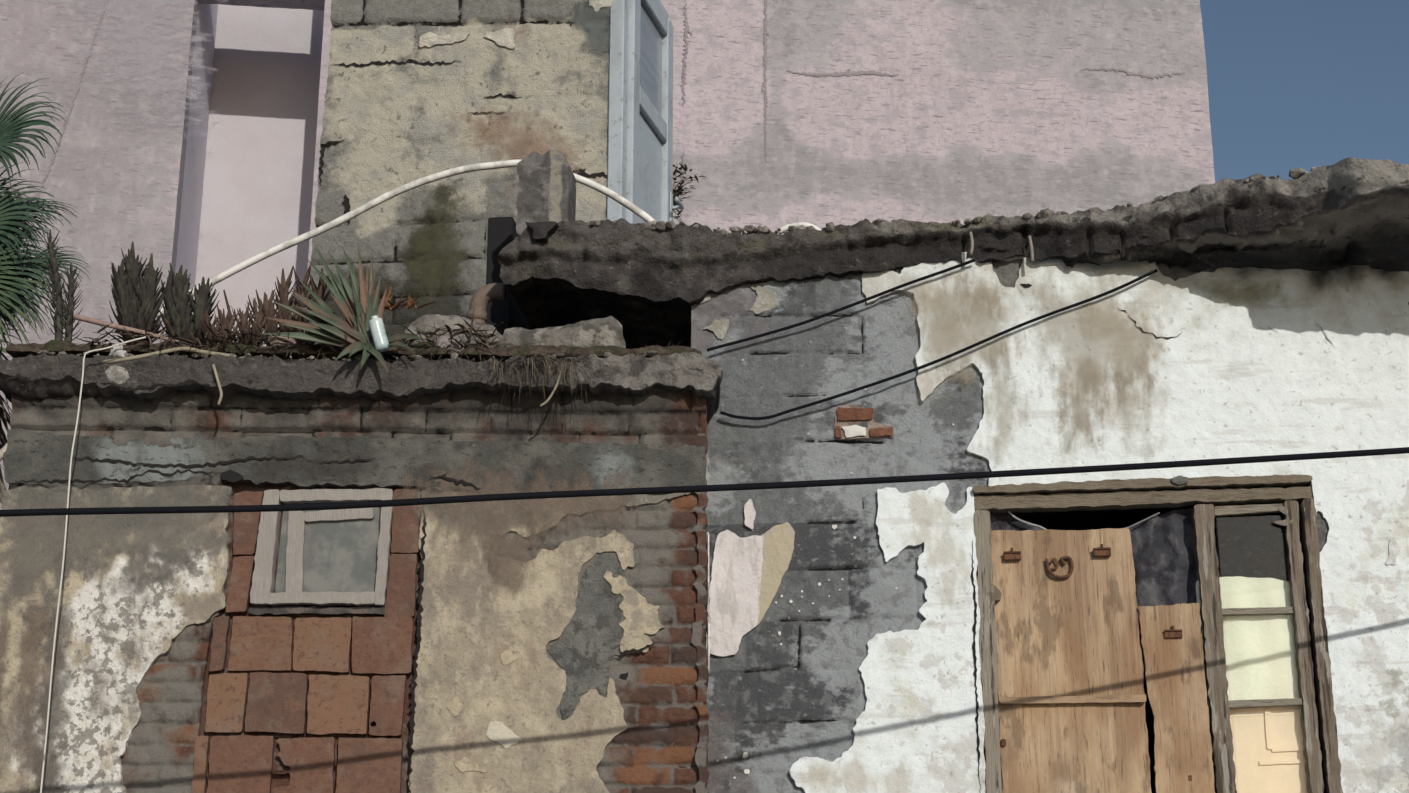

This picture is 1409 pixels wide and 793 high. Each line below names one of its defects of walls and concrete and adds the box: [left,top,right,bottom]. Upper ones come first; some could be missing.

flaking render [1155,263,1207,281]
crack [15,455,374,483]
flaking render [486,274,991,793]
flaking render [121,612,220,793]